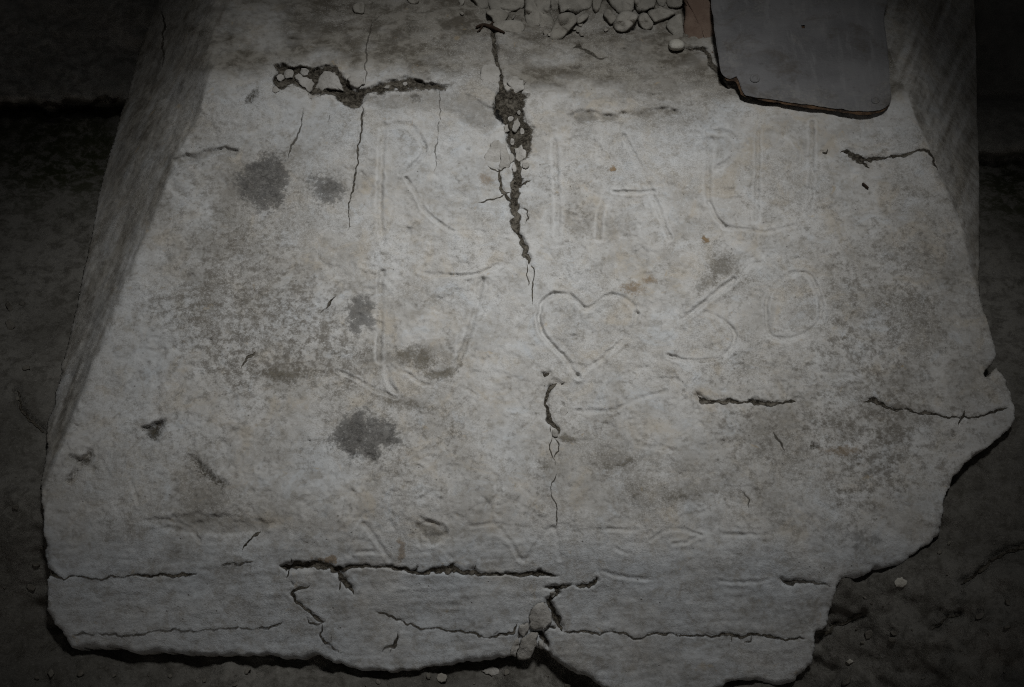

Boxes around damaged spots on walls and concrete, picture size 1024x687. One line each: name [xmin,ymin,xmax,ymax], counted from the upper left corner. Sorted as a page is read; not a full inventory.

crack [348,16,379,227]
crack [482,30,535,304]
crack [822,149,938,170]
crack [543,373,568,525]
crack [697,395,796,407]
crack [864,397,1008,425]
crack [73,559,861,660]